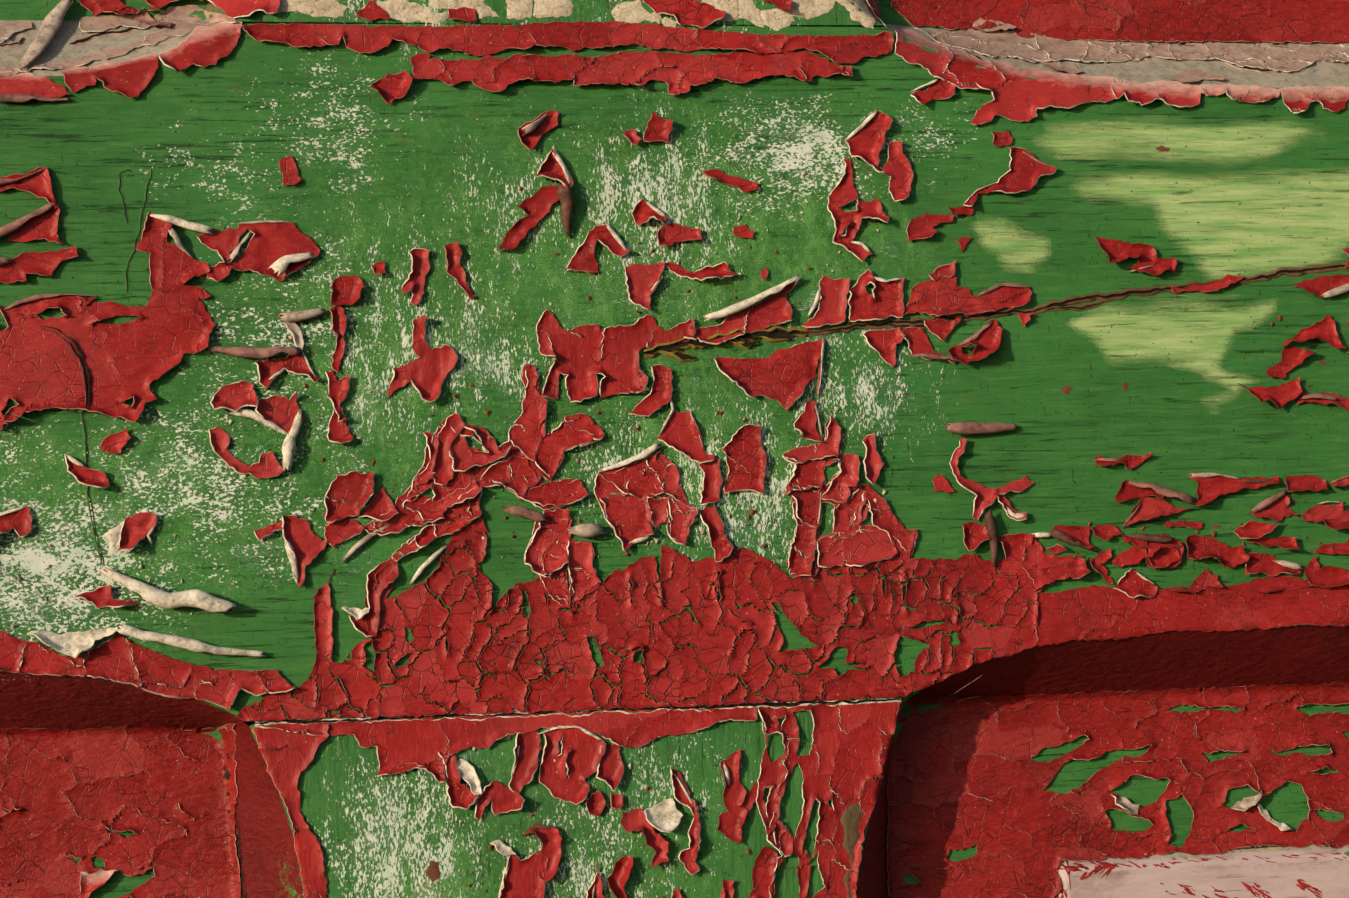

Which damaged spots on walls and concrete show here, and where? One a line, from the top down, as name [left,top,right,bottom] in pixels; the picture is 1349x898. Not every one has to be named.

crack [938,43,983,60]
crack [1144,41,1195,60]
crack [1225,42,1348,73]
peeling [495,147,630,274]
peeling [801,110,1033,367]
peeling [0,167,386,479]
crack [643,263,1349,363]
peeling [0,236,1349,898]
crack [255,697,901,727]